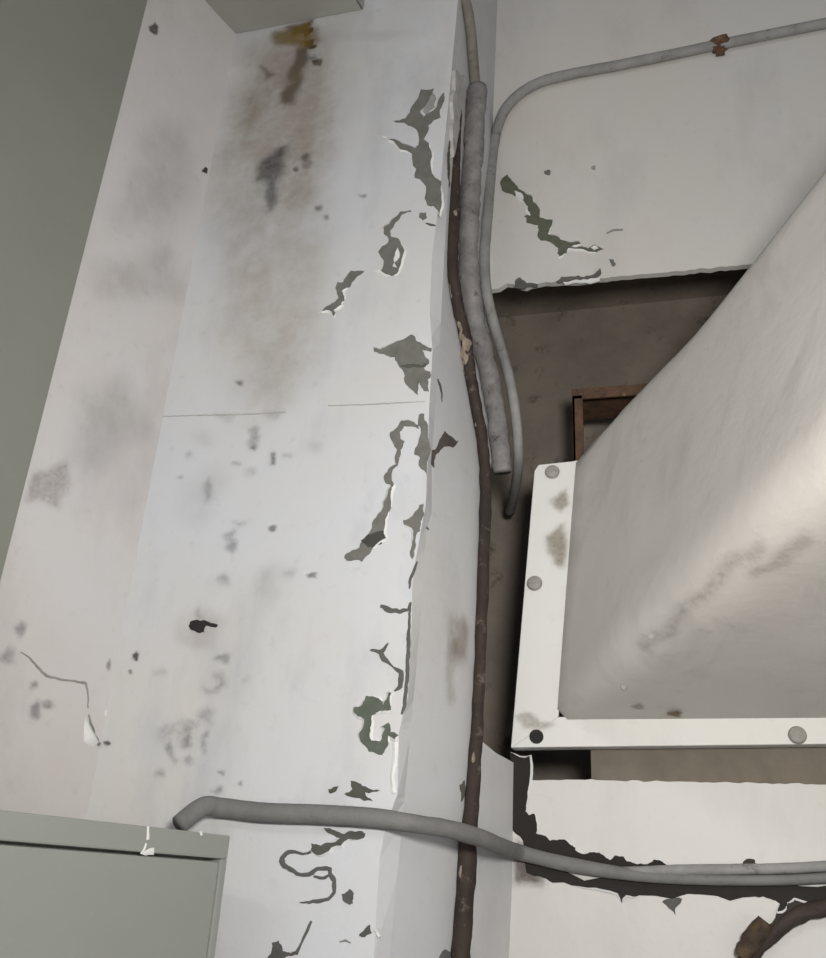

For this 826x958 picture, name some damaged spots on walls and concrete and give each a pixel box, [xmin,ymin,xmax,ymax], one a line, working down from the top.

rust [275,21,312,46]
leakage [282,47,322,103]
leakage [259,148,283,201]
peeling [320,70,465,318]
peeling [500,174,603,259]
peeling [373,335,443,402]
peeling [344,413,458,562]
crack [20,652,89,708]
peeling [328,690,398,801]
flaking render [510,752,668,867]
peeling [279,828,366,905]
flaking render [516,860,826,922]